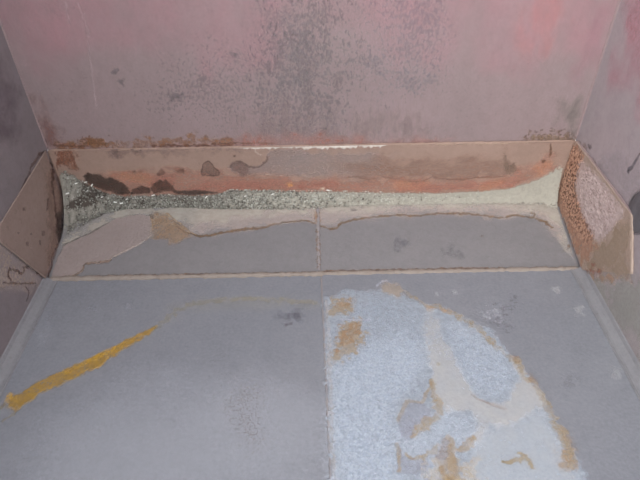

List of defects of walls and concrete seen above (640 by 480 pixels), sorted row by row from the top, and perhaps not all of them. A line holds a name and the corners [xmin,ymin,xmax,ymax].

rust [38,121,233,250]
water stain [59,166,563,238]
rust [109,130,573,197]
peeling [51,214,151,277]